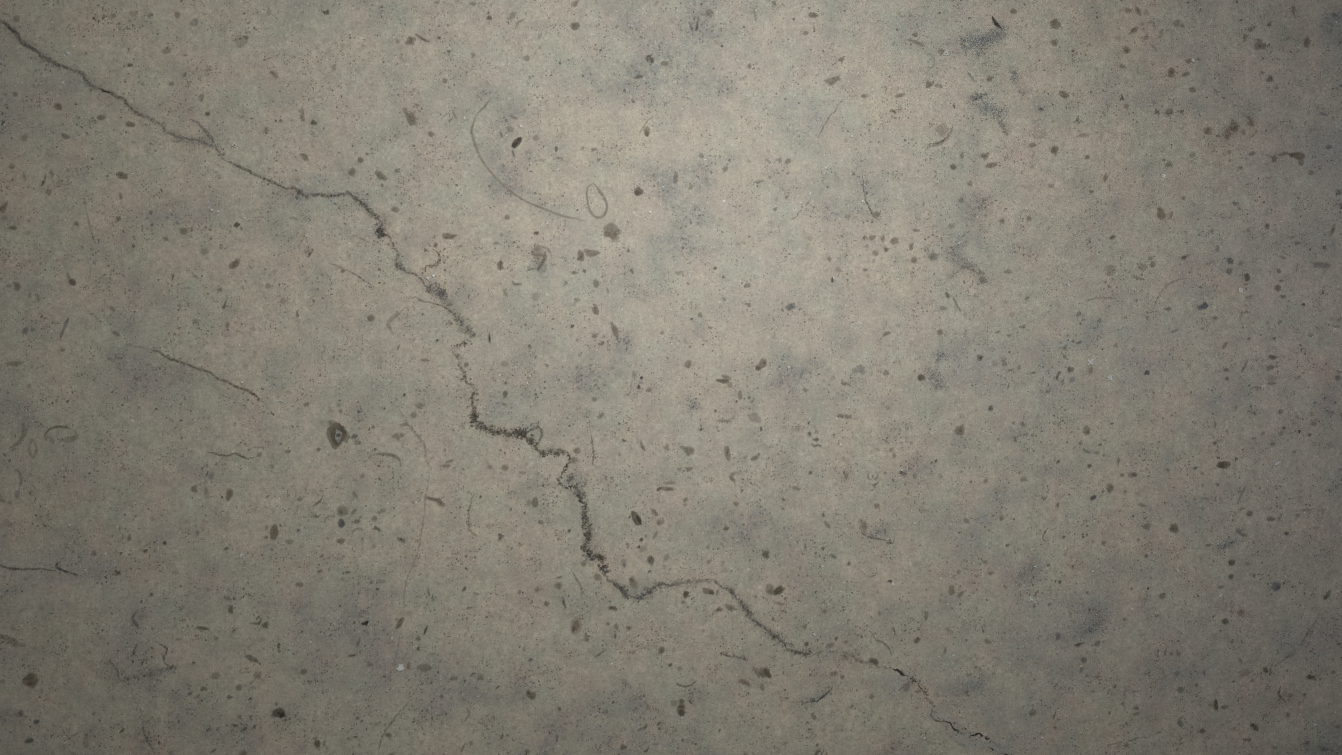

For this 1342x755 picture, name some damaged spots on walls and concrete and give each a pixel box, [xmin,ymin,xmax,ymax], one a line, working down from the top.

crack [250,172,394,247]
crack [153,350,260,399]
crack [467,383,654,600]
crack [2,562,77,575]
crack [893,669,1012,755]